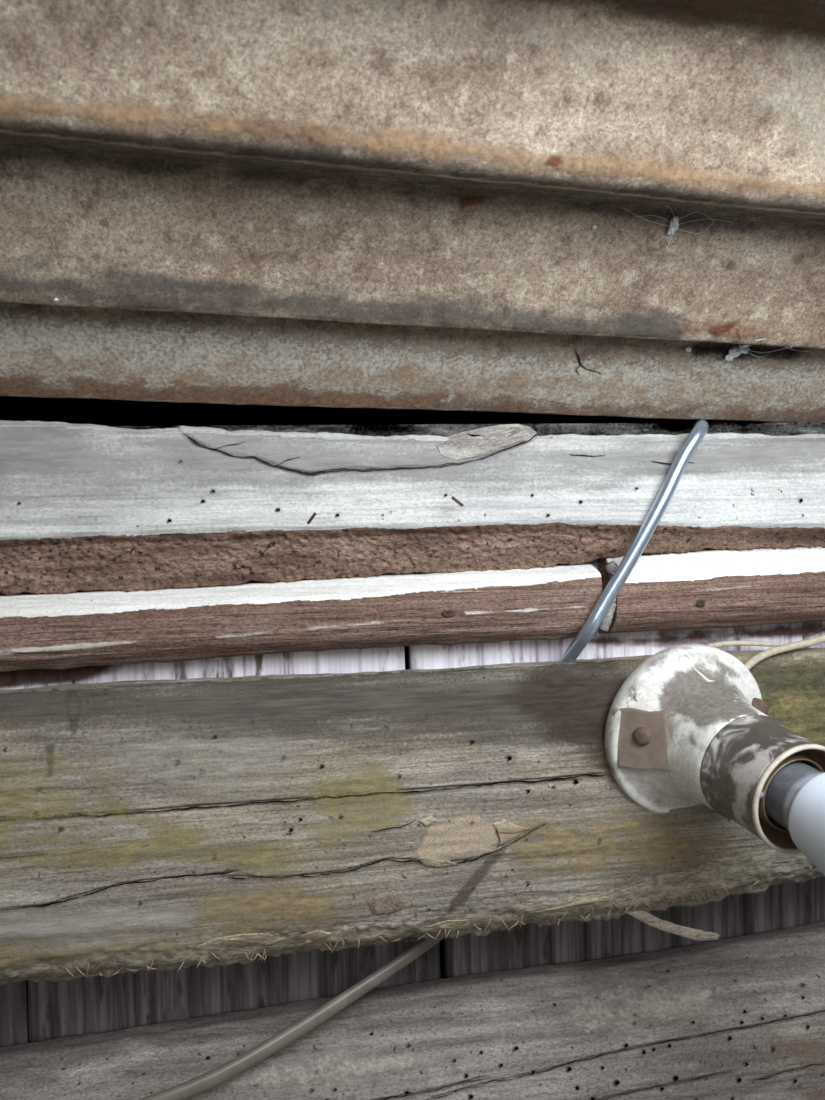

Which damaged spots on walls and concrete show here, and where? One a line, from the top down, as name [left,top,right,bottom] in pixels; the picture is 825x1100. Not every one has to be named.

leakage [589,0,825,154]
rust [0,95,825,196]
crack [184,433,534,475]
leakage [0,659,634,794]
crack [0,774,606,821]
crack [456,824,545,864]
crack [0,859,424,910]
leakage [0,908,196,952]
crack [381,1011,824,1100]